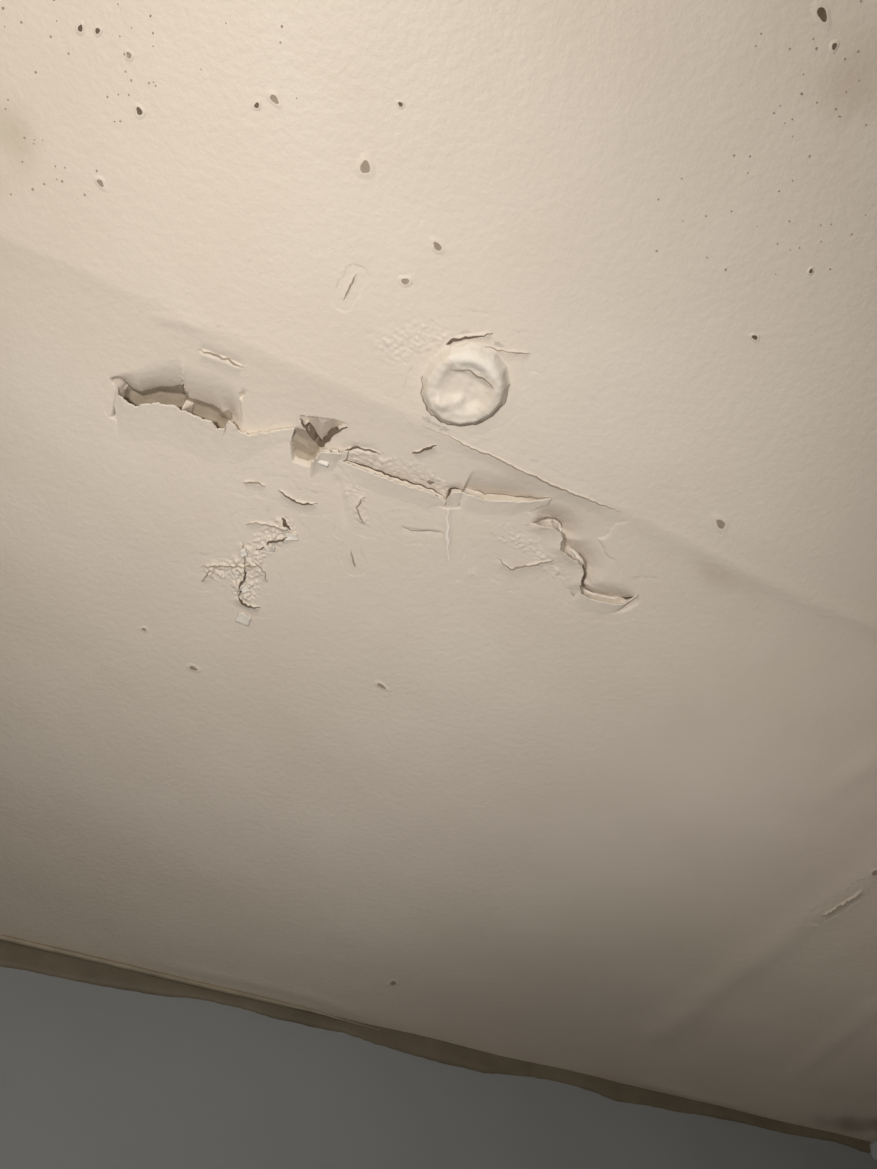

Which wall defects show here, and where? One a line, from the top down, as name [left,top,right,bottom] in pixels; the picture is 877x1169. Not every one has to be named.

hole [122,379,233,429]
peeling [292,416,463,545]
crack [345,414,639,523]
peeling [187,504,309,626]
peeling [470,508,664,623]